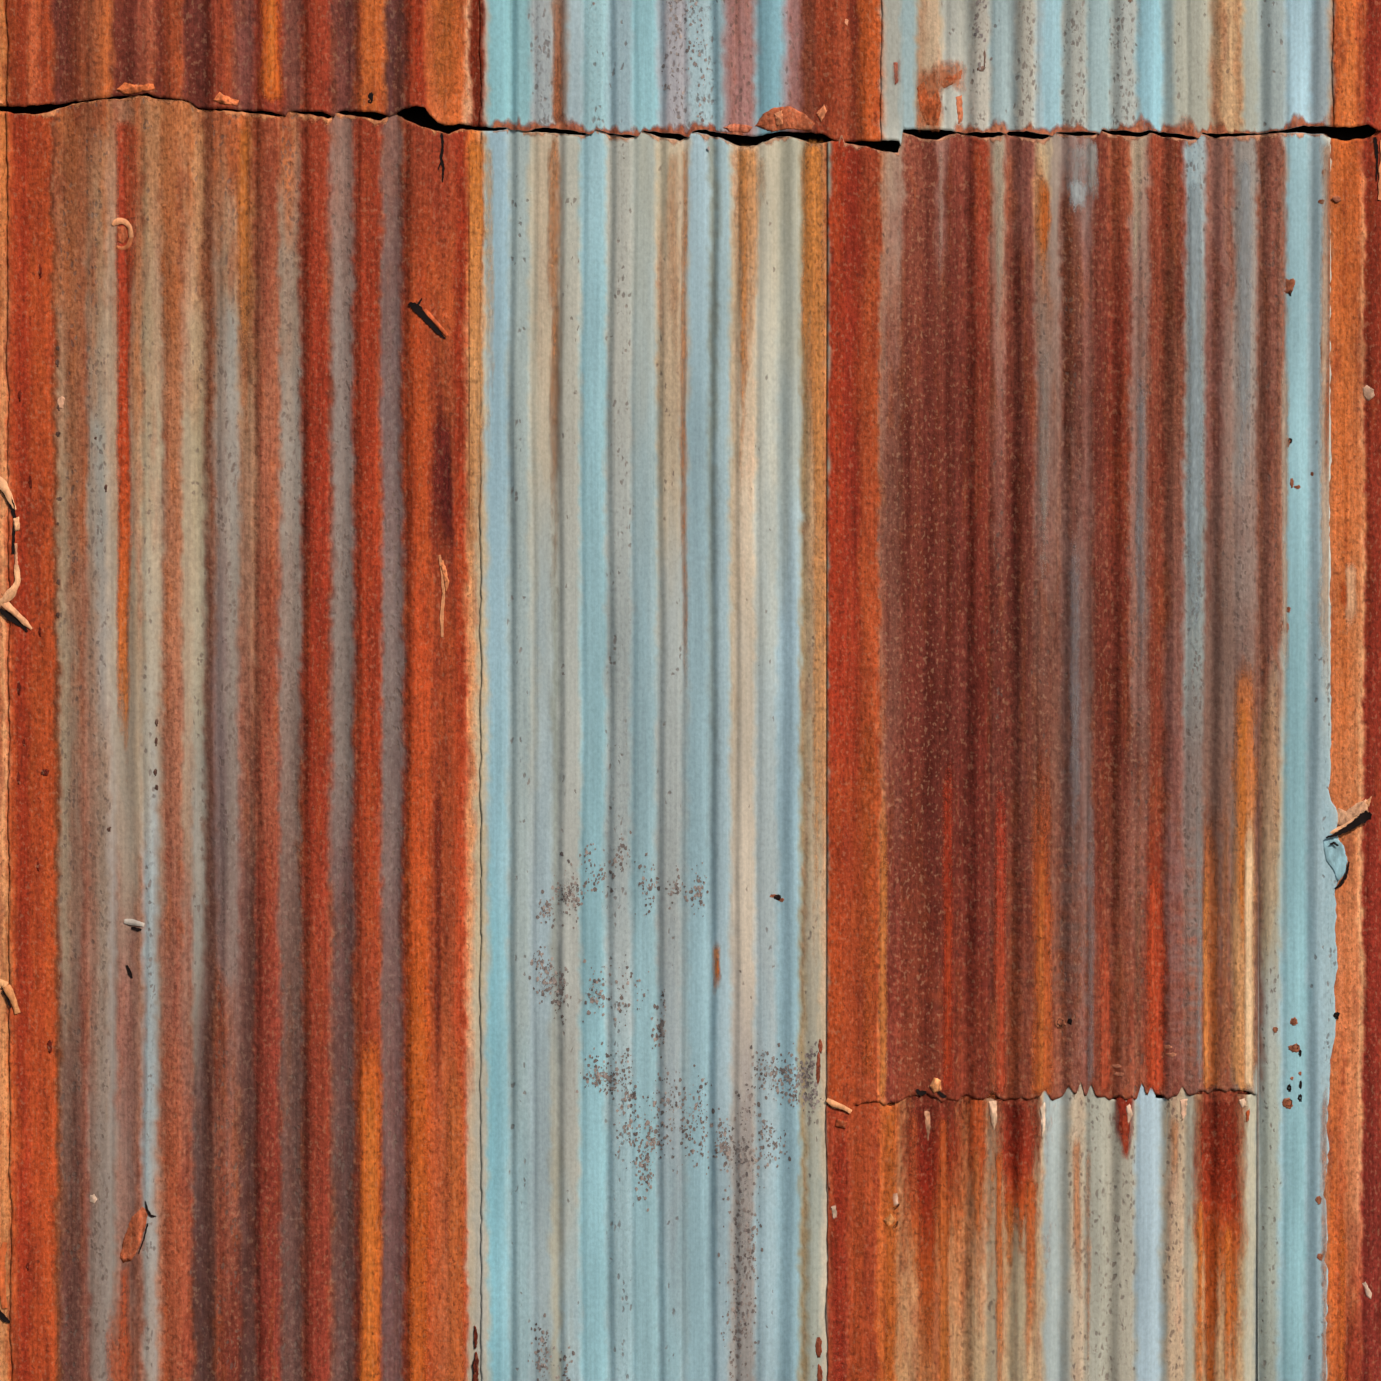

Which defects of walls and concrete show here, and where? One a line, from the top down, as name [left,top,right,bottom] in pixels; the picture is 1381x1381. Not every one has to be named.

peeling [0,476,32,632]
corrosion [117,123,137,722]
corrosion [16,0,492,485]
crack [0,93,1376,182]
corrosion [492,0,1330,831]
corrosion [359,1044,381,1381]
corrosion [409,801,442,1381]
corrosion [528,946,822,1381]
corrosion [885,779,1052,1381]
crack [986,1093,1001,1101]
corrosion [1172,673,1275,1381]
peeling [1323,837,1350,889]